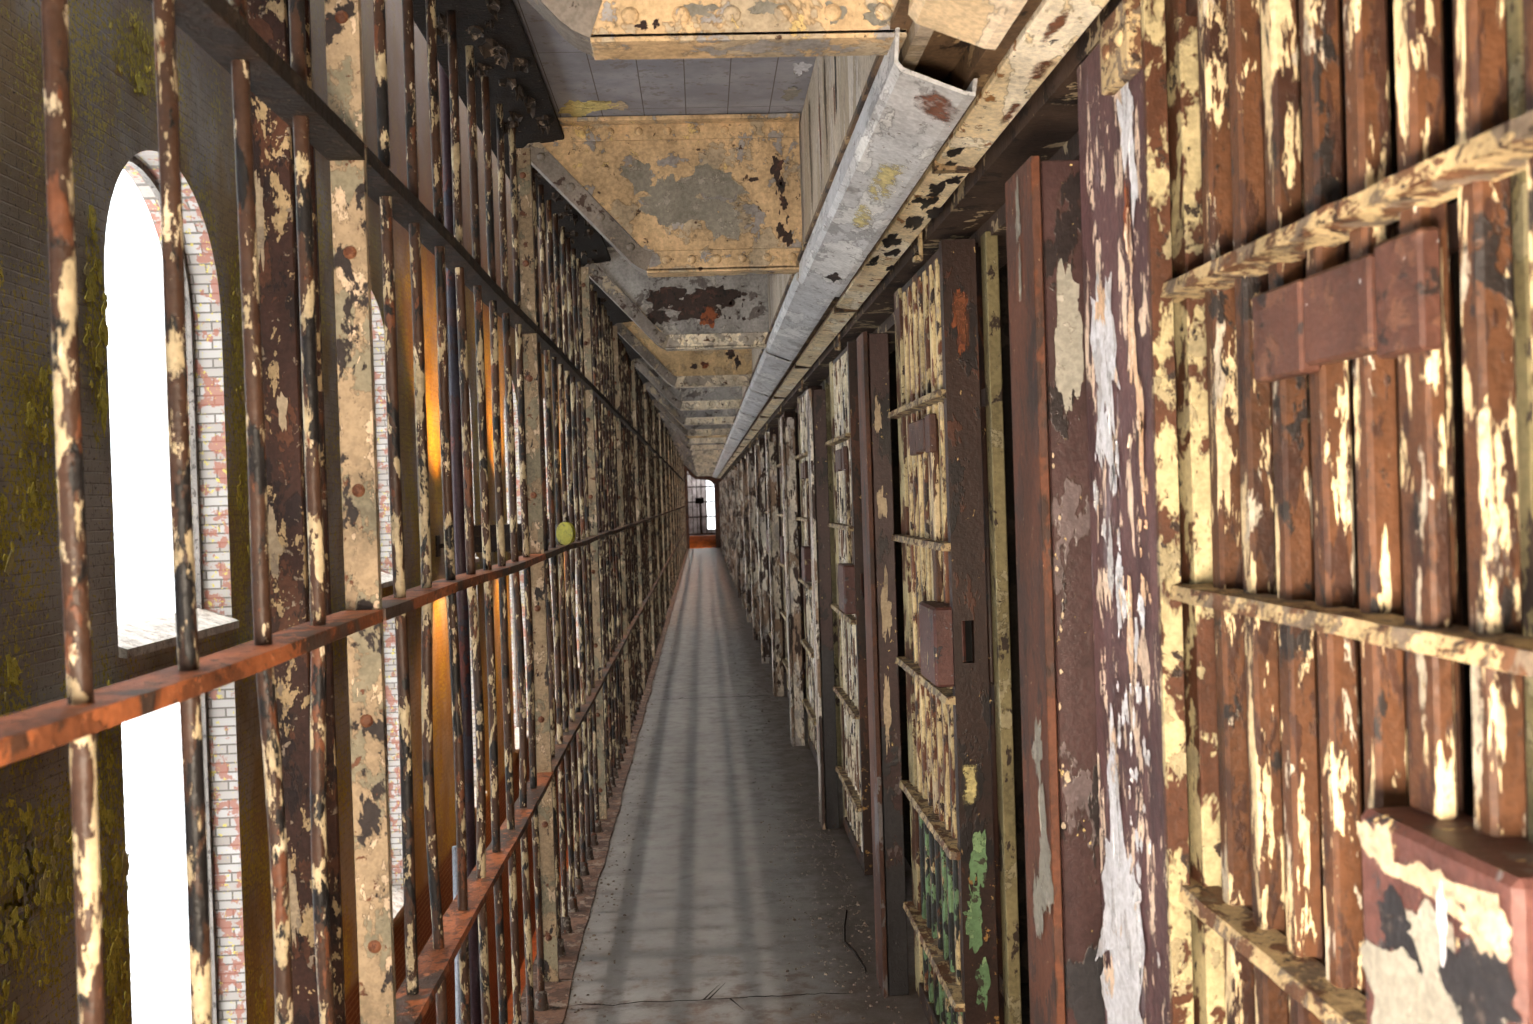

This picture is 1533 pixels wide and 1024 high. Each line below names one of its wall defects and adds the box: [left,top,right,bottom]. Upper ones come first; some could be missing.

peeling [620,156,794,247]
peeling [1116,82,1138,223]
peeling [645,285,760,328]
peeling [1054,258,1160,1024]
peeling [963,766,977,803]
peeling [1031,716,1066,939]
peeling [963,830,991,1010]
peeling [1357,819,1523,1024]